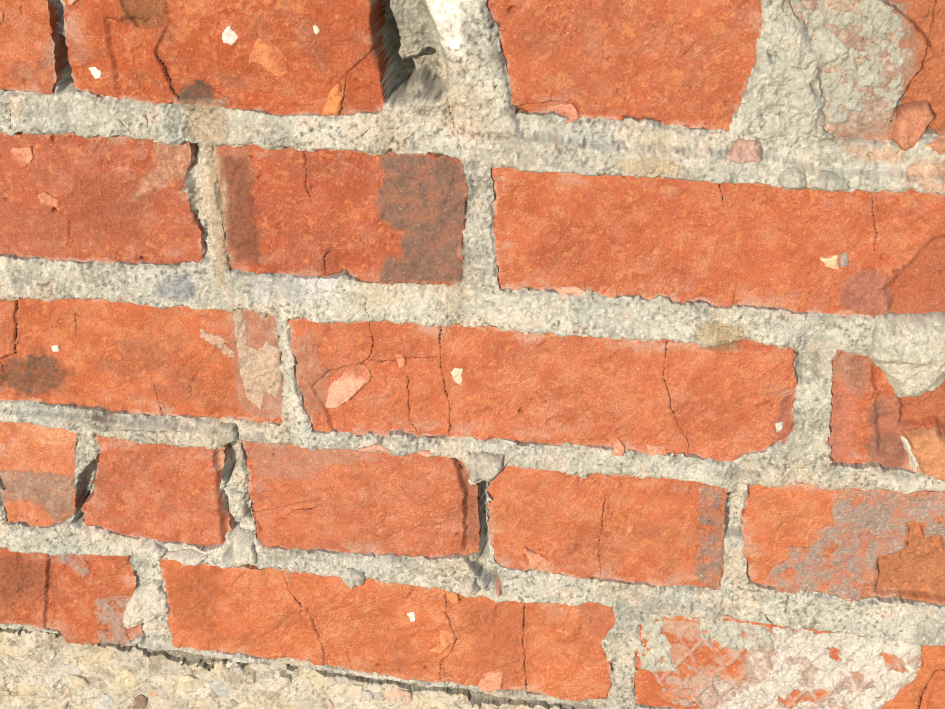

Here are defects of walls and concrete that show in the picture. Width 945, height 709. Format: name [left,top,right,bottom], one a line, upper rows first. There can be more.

spalling [901,0,945,155]
crack [0,300,18,374]
crack [365,299,451,431]
crack [663,340,690,446]
spalling [763,425,945,605]
peeling [699,626,945,709]